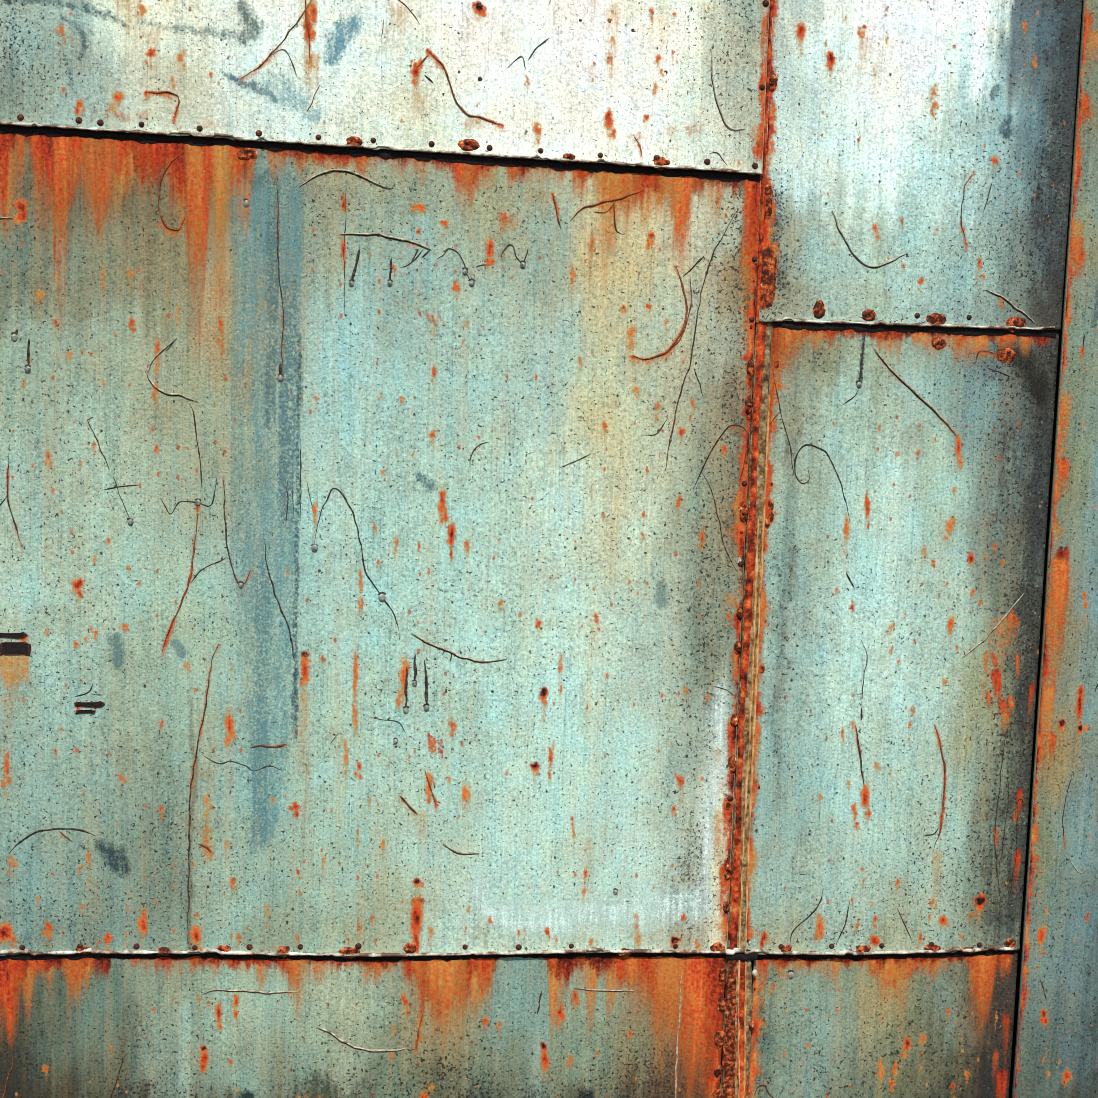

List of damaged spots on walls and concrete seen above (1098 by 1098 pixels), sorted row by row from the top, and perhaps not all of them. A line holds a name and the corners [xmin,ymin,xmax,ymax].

damp [1000,114,1012,138]
damp [230,165,304,851]
rust [189,877,496,1042]
rust [199,1045,208,1072]